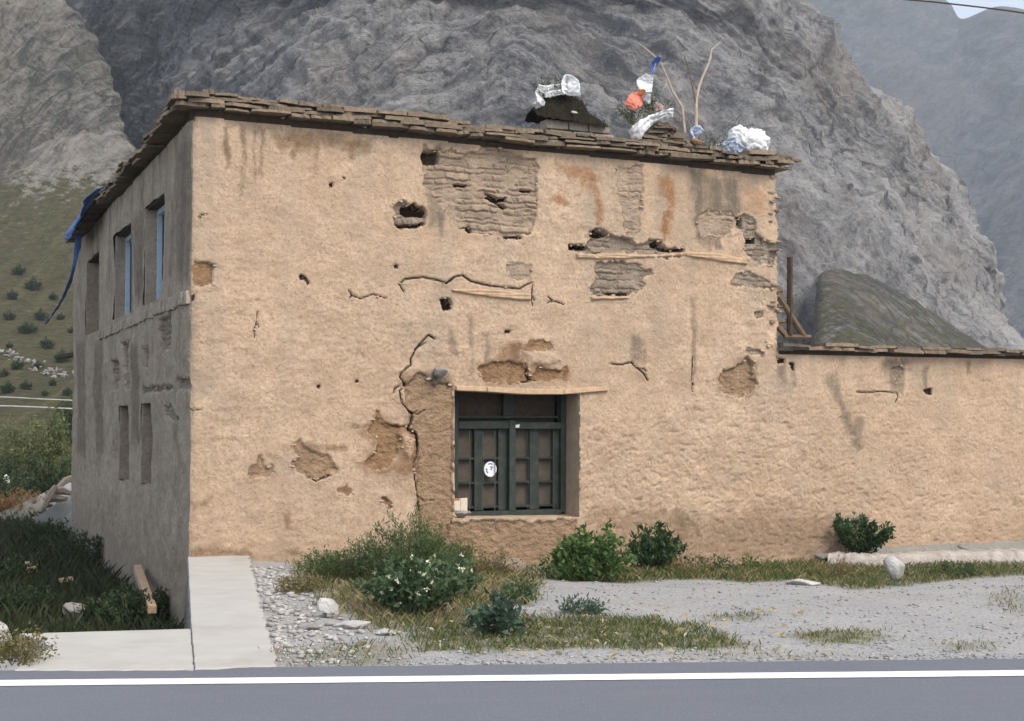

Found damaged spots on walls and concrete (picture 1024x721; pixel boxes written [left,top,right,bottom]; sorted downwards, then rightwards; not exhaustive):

spalling [191,260,218,287]
spalling [392,200,426,230]
crack [348,275,564,306]
spalling [420,144,539,241]
spalling [570,165,684,296]
flaking render [696,209,777,290]
spalling [478,339,569,385]
spalling [718,345,778,398]
crack [387,334,435,510]
flaking render [247,439,338,479]
spalling [365,373,578,566]